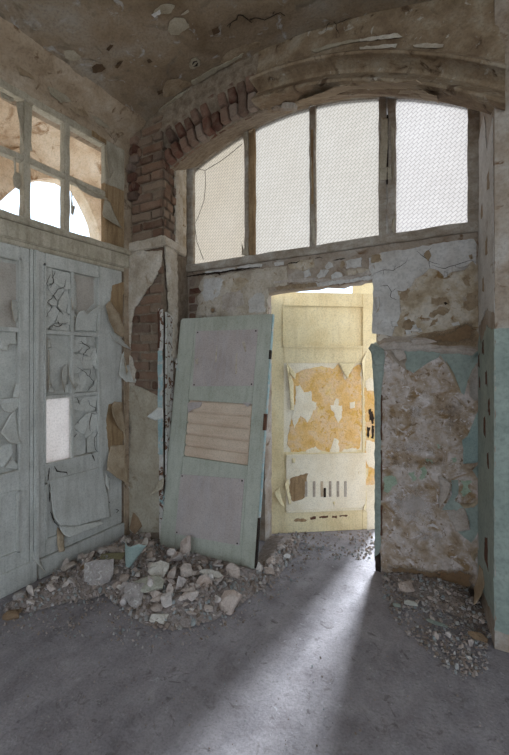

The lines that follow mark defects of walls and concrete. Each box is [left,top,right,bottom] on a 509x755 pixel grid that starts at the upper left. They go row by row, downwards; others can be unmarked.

peeling [152,4,189,35]
crack [227,12,285,28]
peeling [311,33,402,53]
flaking render [189,242,288,318]
crack [376,253,474,300]
flaking render [46,247,164,455]
peeling [339,117,509,635]
peeling [0,410,21,469]